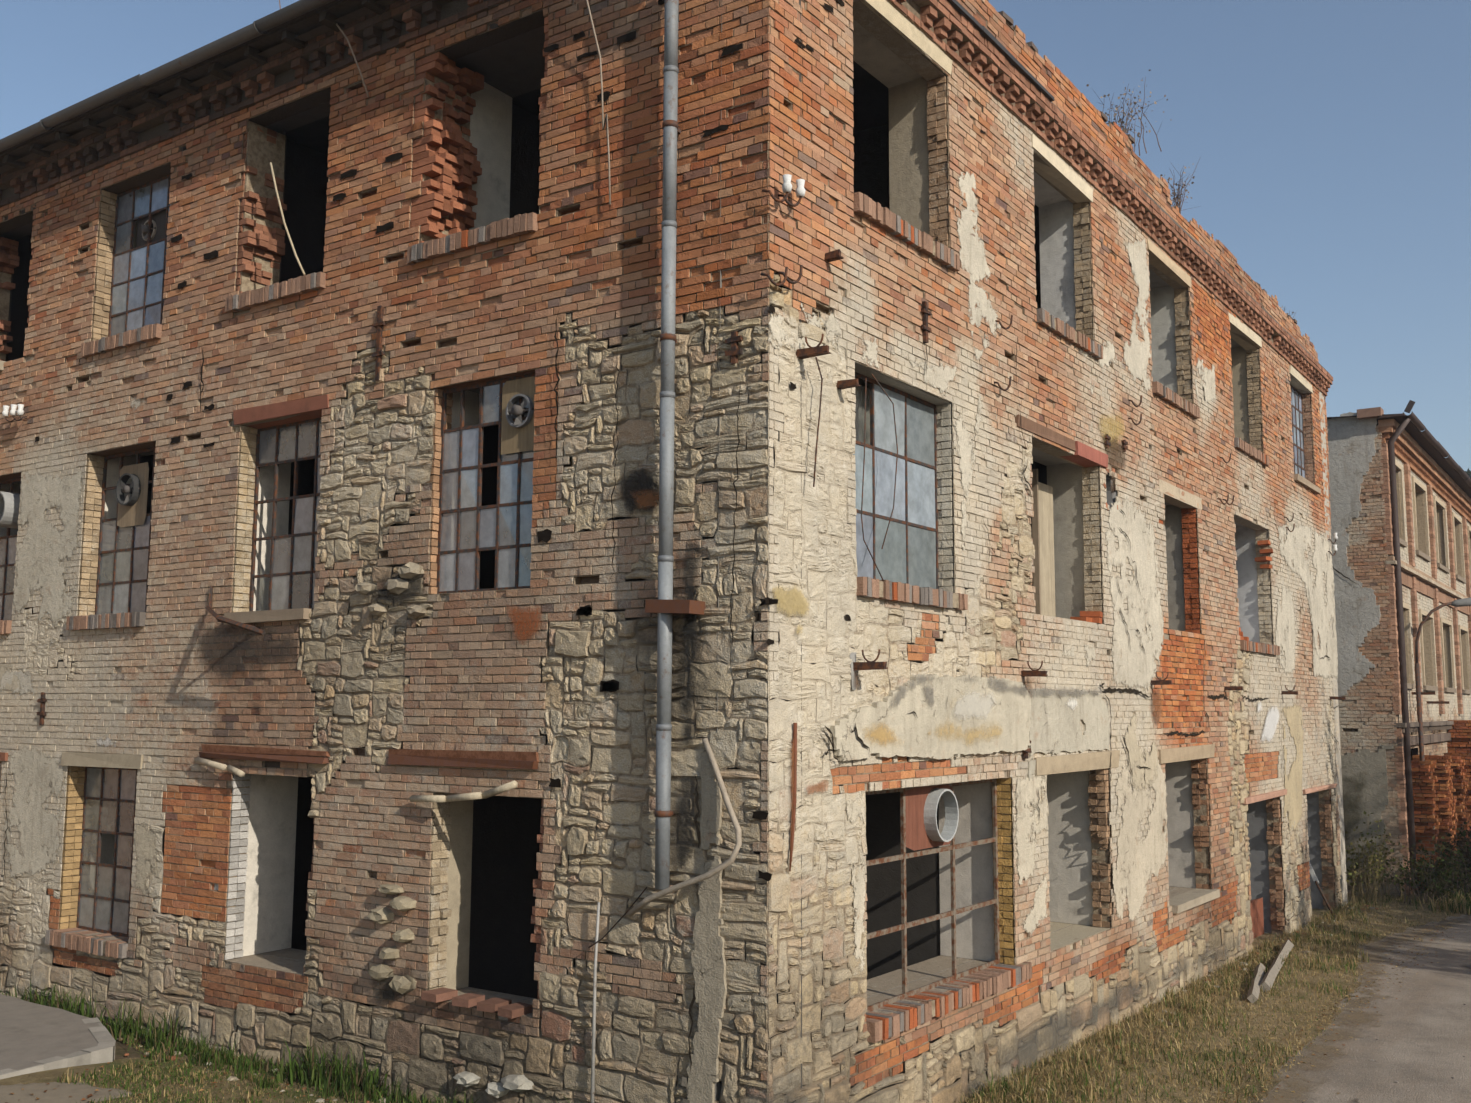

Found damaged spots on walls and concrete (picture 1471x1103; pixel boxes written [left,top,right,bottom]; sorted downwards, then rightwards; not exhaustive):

peeling [967,279,1001,360]
hole [1103,468,1119,511]
leakage [200,627,297,675]
peeling [1275,585,1296,674]
spalling [830,756,966,795]